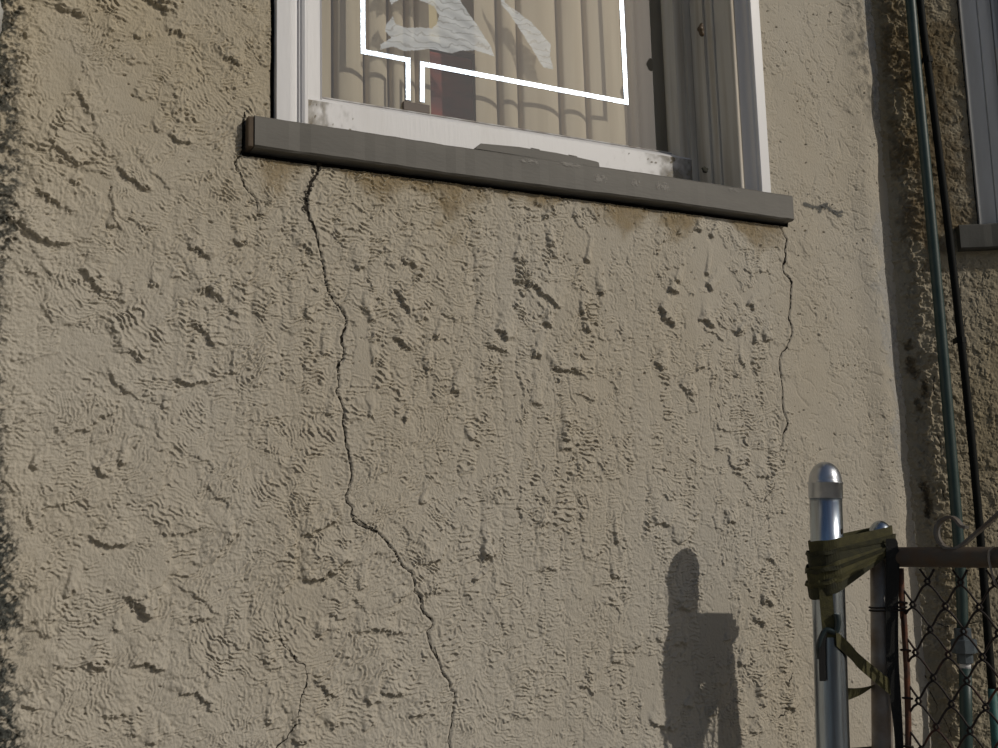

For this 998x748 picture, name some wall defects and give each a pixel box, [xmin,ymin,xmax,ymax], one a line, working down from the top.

crack [234,112,264,216]
crack [778,226,793,453]
crack [301,162,455,748]
crack [274,604,308,748]